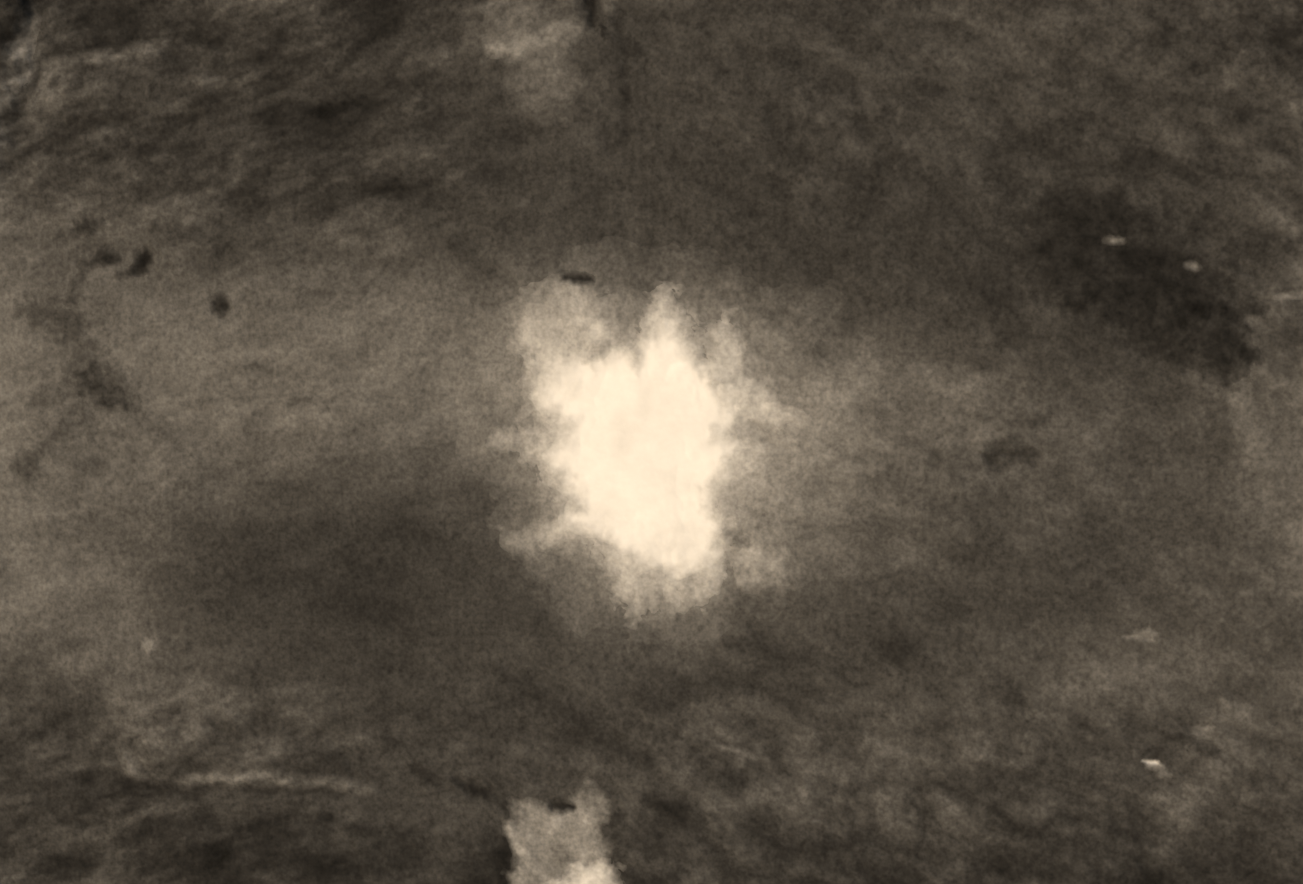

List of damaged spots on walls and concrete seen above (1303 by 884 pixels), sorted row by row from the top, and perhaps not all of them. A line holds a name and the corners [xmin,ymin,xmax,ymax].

crack [592,0,633,146]
flaking render [455,236,891,655]
spalling [547,797,579,817]